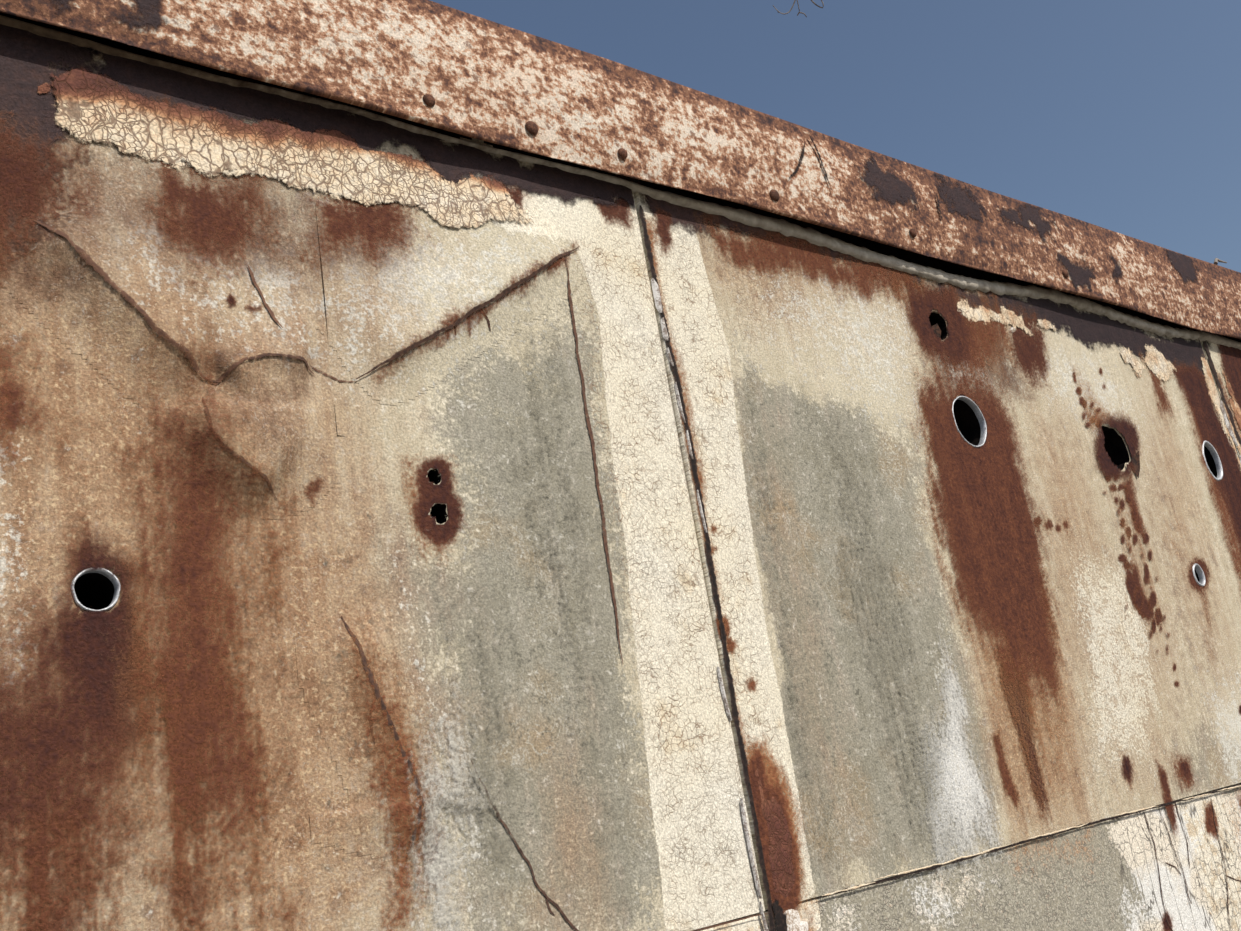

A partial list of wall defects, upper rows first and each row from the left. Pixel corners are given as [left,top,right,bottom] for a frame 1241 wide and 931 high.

peeling [114,0,168,32]
corrosion [0,334,300,931]
crack [34,220,623,663]
crack [341,616,424,862]
crack [471,760,579,931]
peeling [0,24,1241,467]
crack [639,205,776,931]
corrosion [738,711,813,931]
corrosion [892,275,1071,820]
corrosion [1073,368,1179,687]
corrosion [1172,344,1241,591]
crack [1204,341,1241,463]